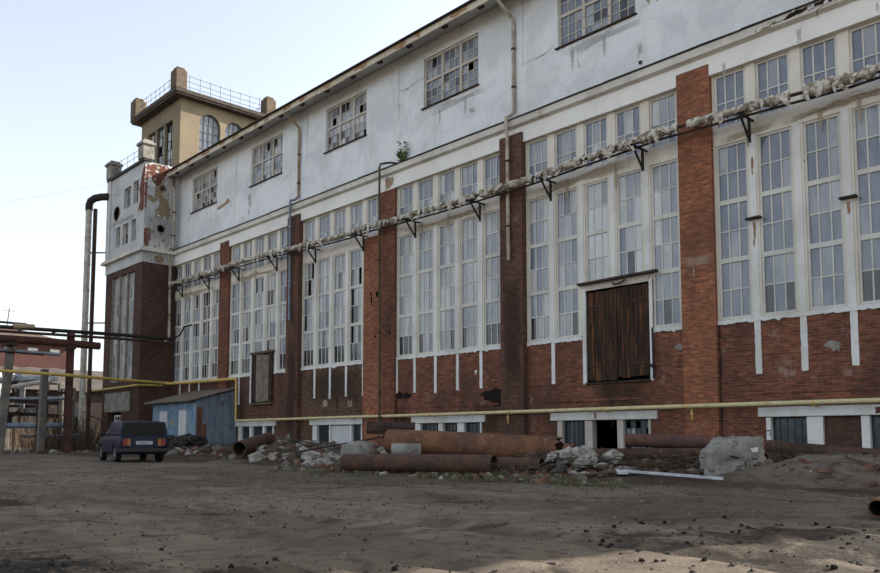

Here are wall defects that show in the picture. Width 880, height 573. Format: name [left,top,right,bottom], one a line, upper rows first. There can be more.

peeling [755,0,834,33]
peeling [137,162,176,263]